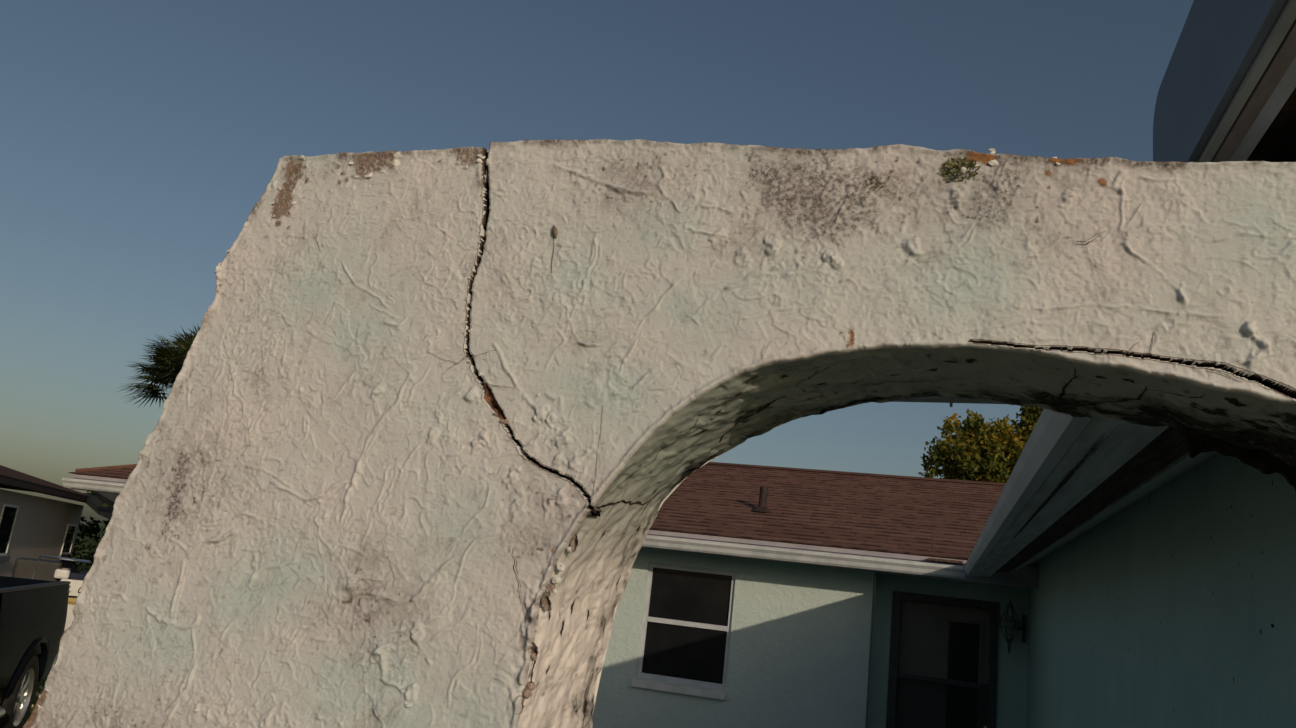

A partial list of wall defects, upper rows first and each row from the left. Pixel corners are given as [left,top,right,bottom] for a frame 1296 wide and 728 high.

peeling [271,155,308,229]
crack [430,147,838,517]
leakage [715,376,771,423]
leakage [979,390,1123,417]
crack [970,332,1296,405]
leakage [1150,398,1296,462]